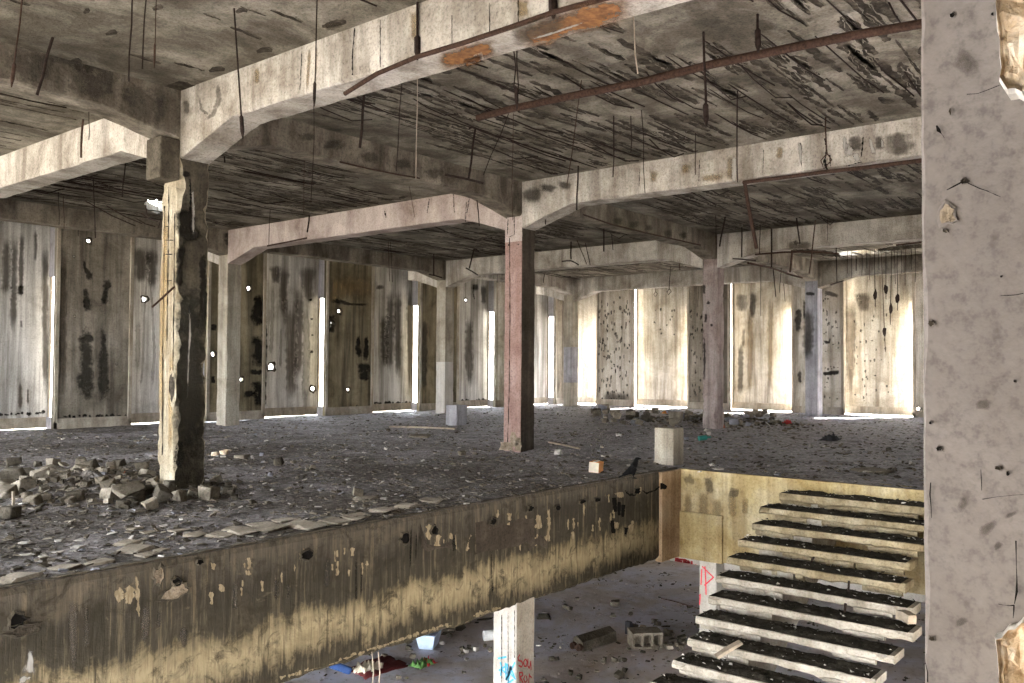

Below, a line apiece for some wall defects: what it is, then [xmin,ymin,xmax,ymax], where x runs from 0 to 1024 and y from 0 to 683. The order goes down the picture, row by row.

corrosion [442,43,493,67]
corrosion [515,2,625,45]
spalling [991,0,1024,101]
peeling [414,90,646,174]
leakage [2,233,111,399]
leakage [377,285,428,389]
leakage [0,385,45,416]
spalling [525,487,642,546]
peeling [114,576,140,616]
spalling [151,563,192,602]
leakage [20,653,33,683]
spalling [995,617,1024,683]